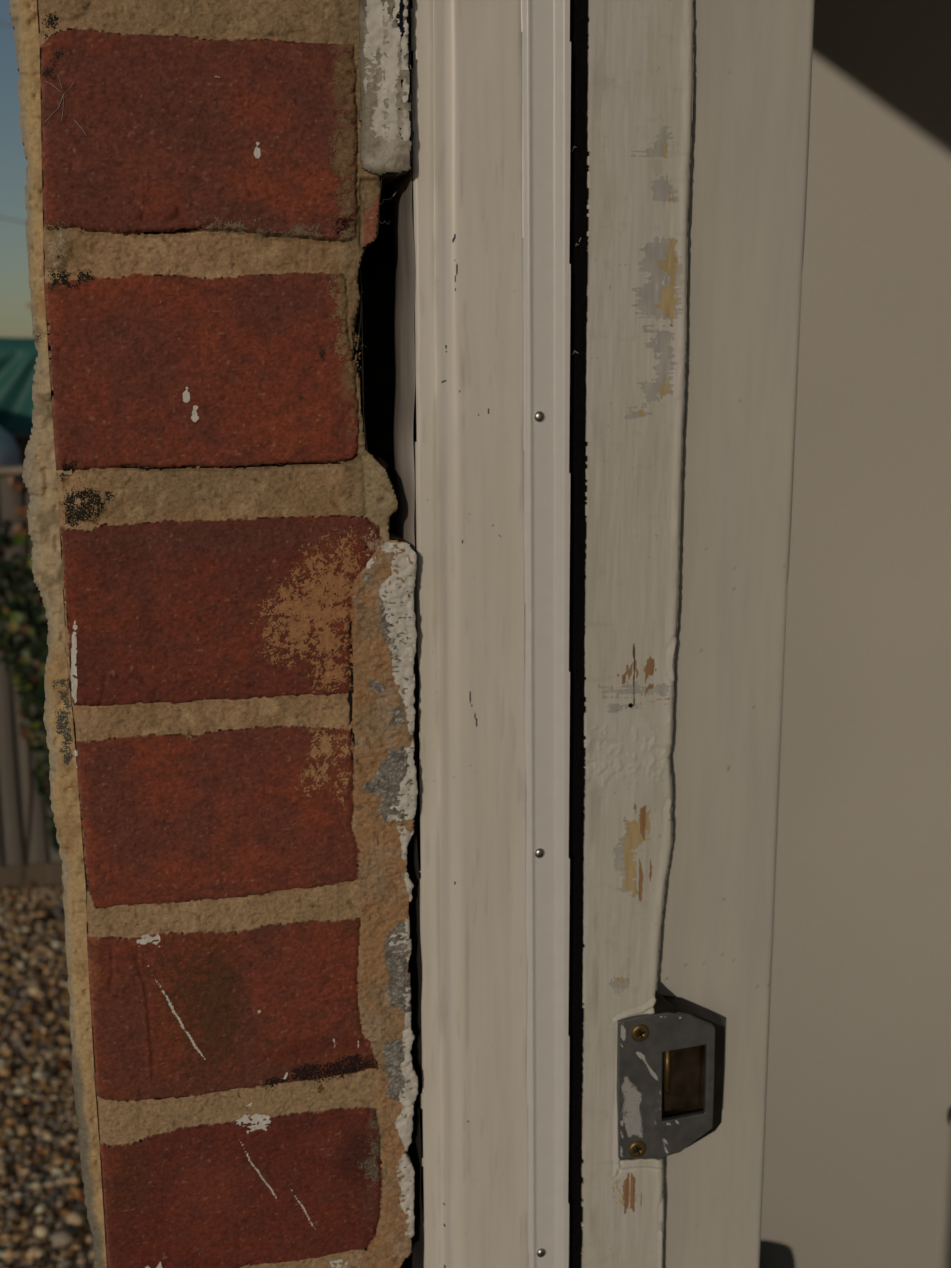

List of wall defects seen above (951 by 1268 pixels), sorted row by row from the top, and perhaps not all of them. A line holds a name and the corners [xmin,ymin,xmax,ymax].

peeling [363,0,411,143]
peeling [630,120,679,205]
peeling [624,236,685,420]
peeling [359,542,418,902]
peeling [598,644,672,713]
peeling [613,804,652,902]
peeling [381,919,418,1238]